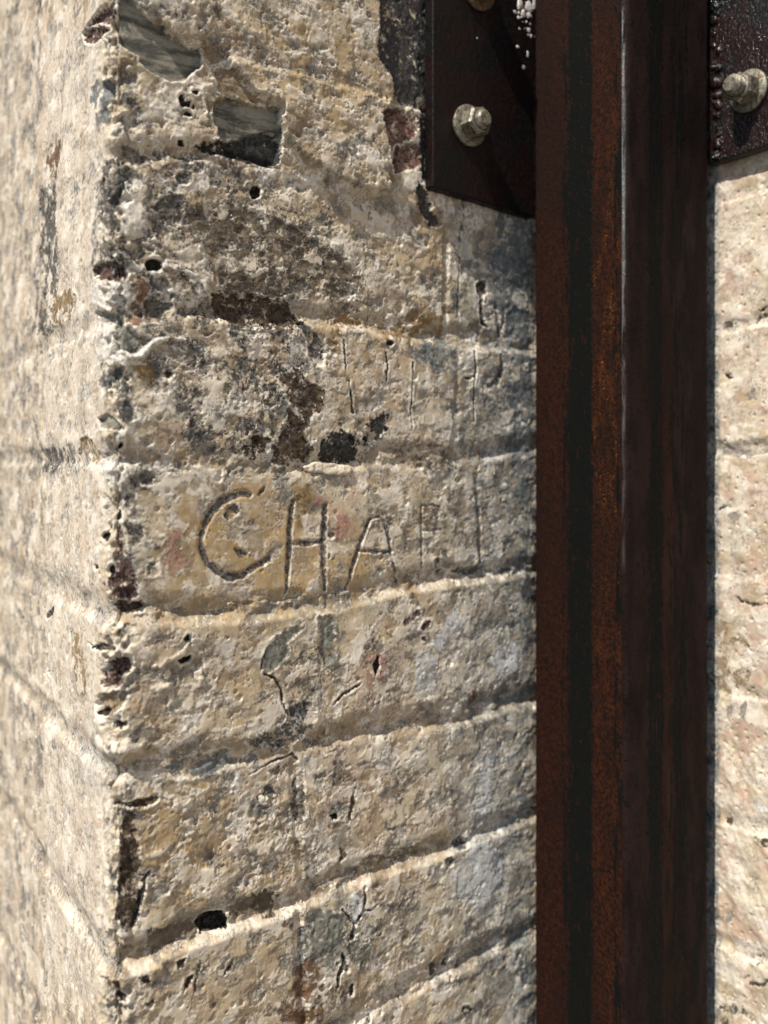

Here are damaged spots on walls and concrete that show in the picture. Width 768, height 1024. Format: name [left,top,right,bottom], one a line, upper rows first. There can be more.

spalling [84,0,283,168]
flaking render [384,107,422,173]
crack [261,650,288,715]
crack [335,684,358,702]
crack [256,753,298,771]
spalling [114,796,158,933]